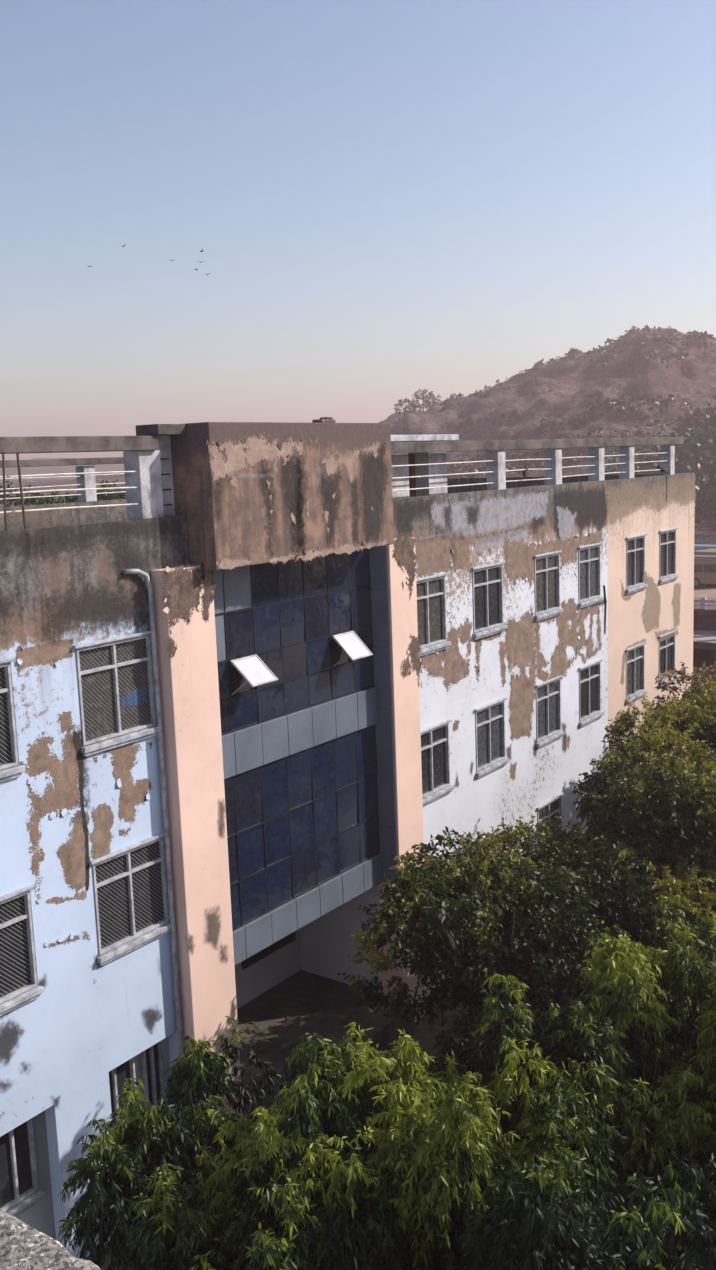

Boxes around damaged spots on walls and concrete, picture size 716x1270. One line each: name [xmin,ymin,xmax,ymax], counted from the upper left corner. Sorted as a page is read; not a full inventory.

damp [261,457,304,552]
peeling [206,432,380,526]
damp [322,448,451,544]
damp [467,502,479,528]
damp [532,473,697,540]
damp [0,513,181,642]
peeling [160,490,602,661]
peeling [15,639,74,672]
peeling [401,597,602,740]
crack [73,731,90,891]
peeling [25,711,153,905]
peeling [44,931,91,947]